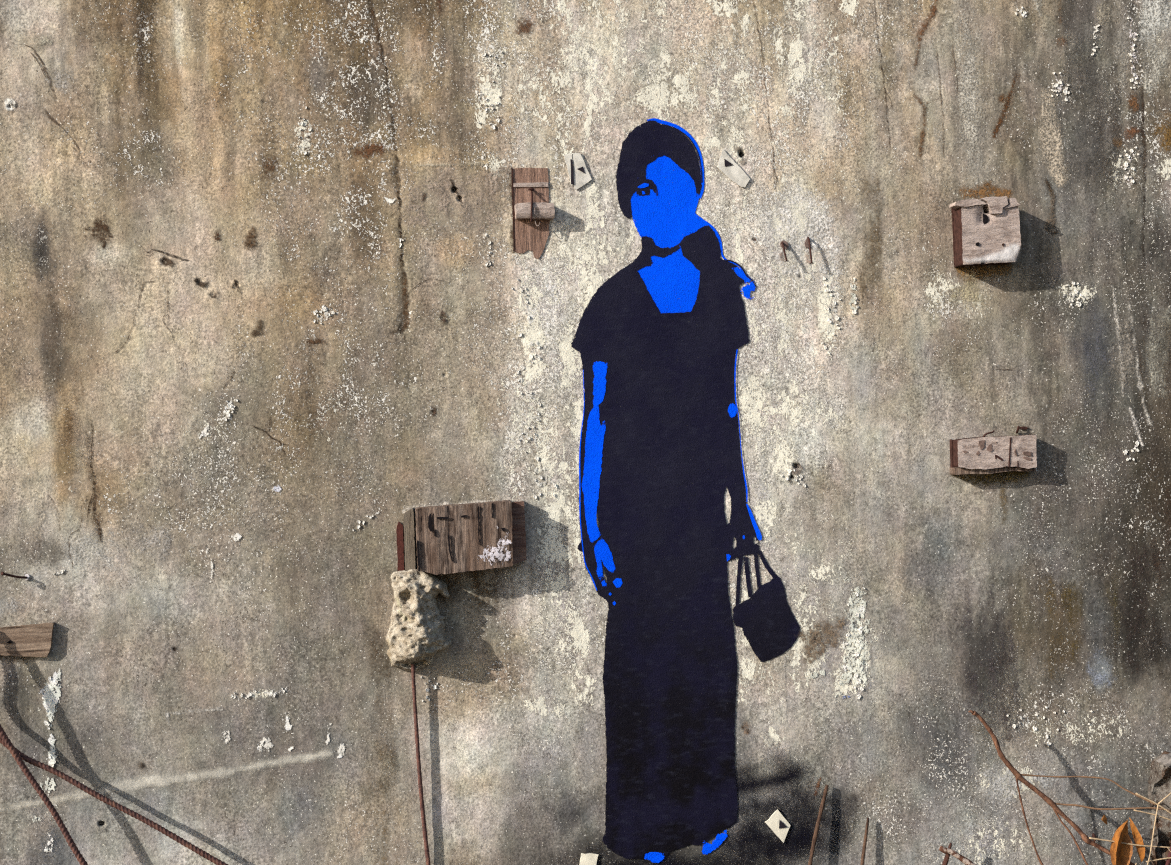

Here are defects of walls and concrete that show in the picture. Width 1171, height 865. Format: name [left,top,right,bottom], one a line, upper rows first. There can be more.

crack [368,0,449,360]
crack [753,3,777,189]
crack [873,0,893,145]
corrosion [916,97,928,156]
corrosion [914,0,937,66]
corrosion [960,182,1012,199]
corrosion [993,76,1019,137]
crack [49,424,101,568]